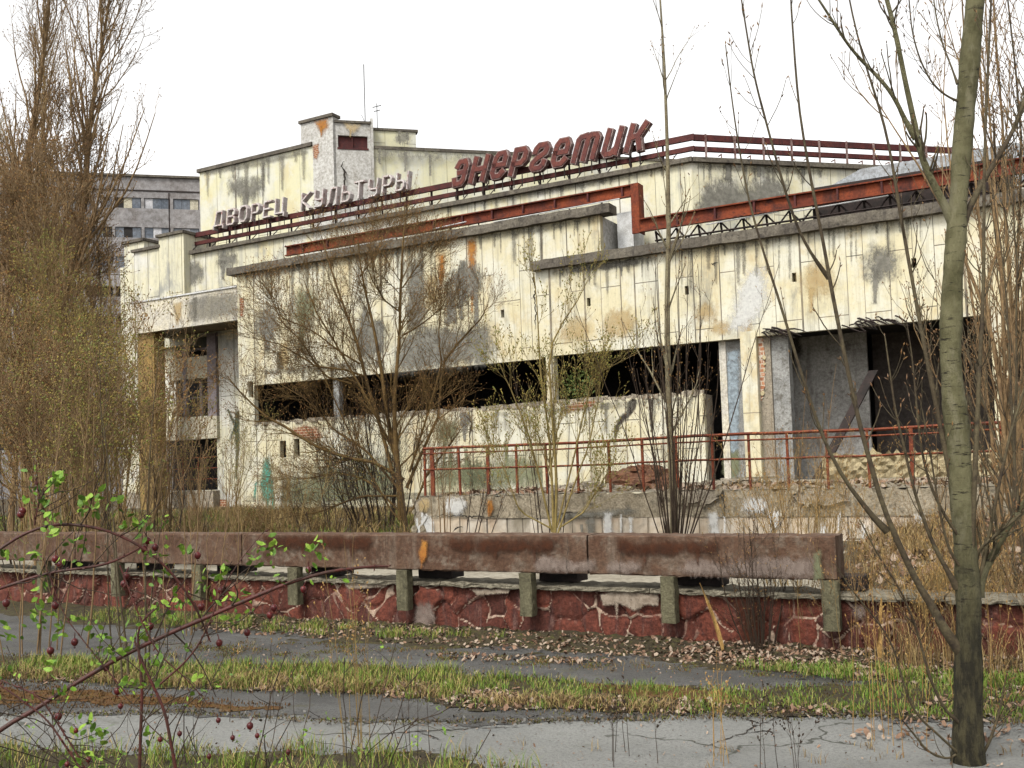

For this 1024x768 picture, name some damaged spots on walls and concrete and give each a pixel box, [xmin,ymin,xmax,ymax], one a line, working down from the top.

water stain [228,166,264,218]
water stain [696,164,805,209]
rust [467,239,476,267]
water stain [863,247,897,303]
water stain [352,260,494,372]
rust [419,541,427,562]
spalling [600,592,659,617]